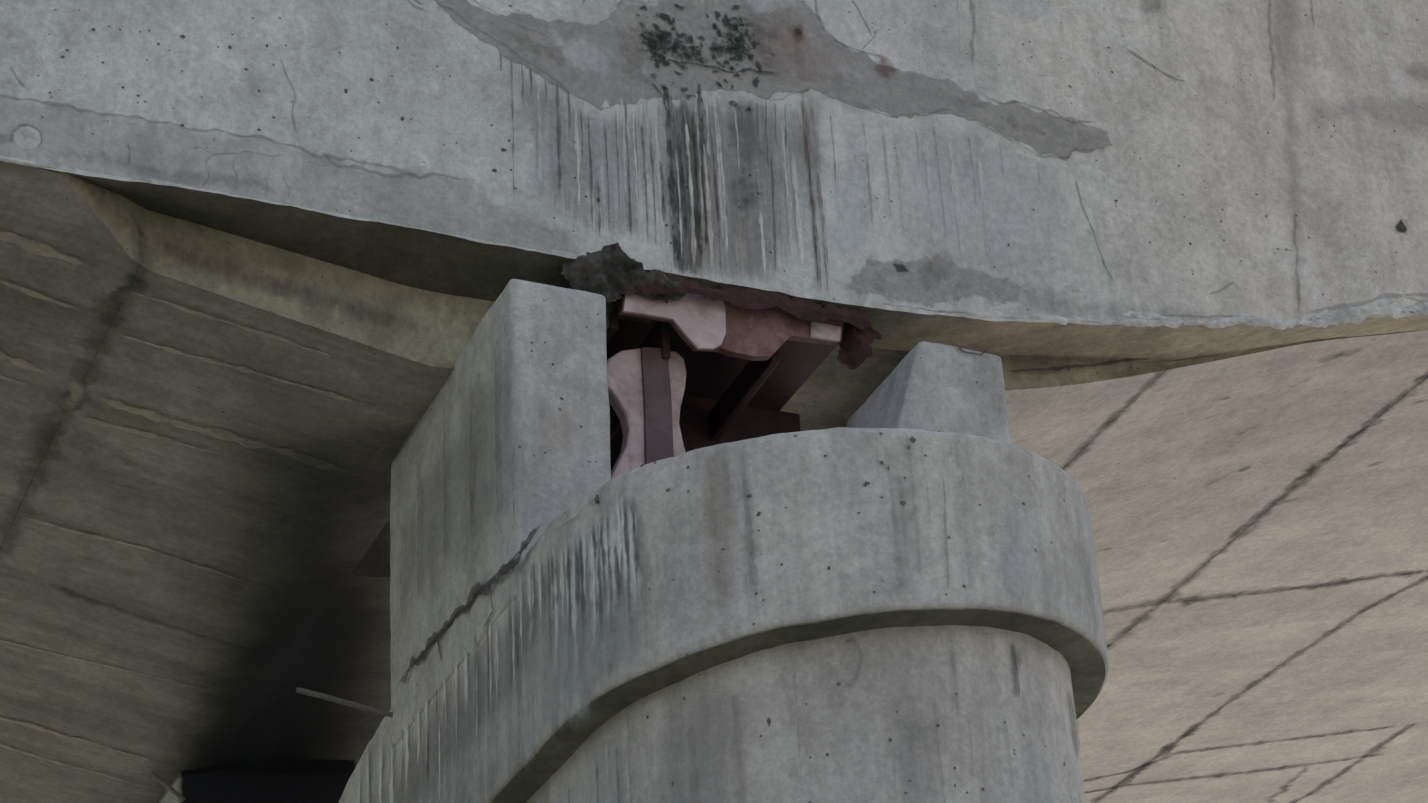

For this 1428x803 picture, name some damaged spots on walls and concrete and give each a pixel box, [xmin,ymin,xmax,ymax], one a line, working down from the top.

leakage [500,4,803,269]
spalling [436,0,1113,161]
spalling [561,243,1428,370]
crack [934,341,1142,372]